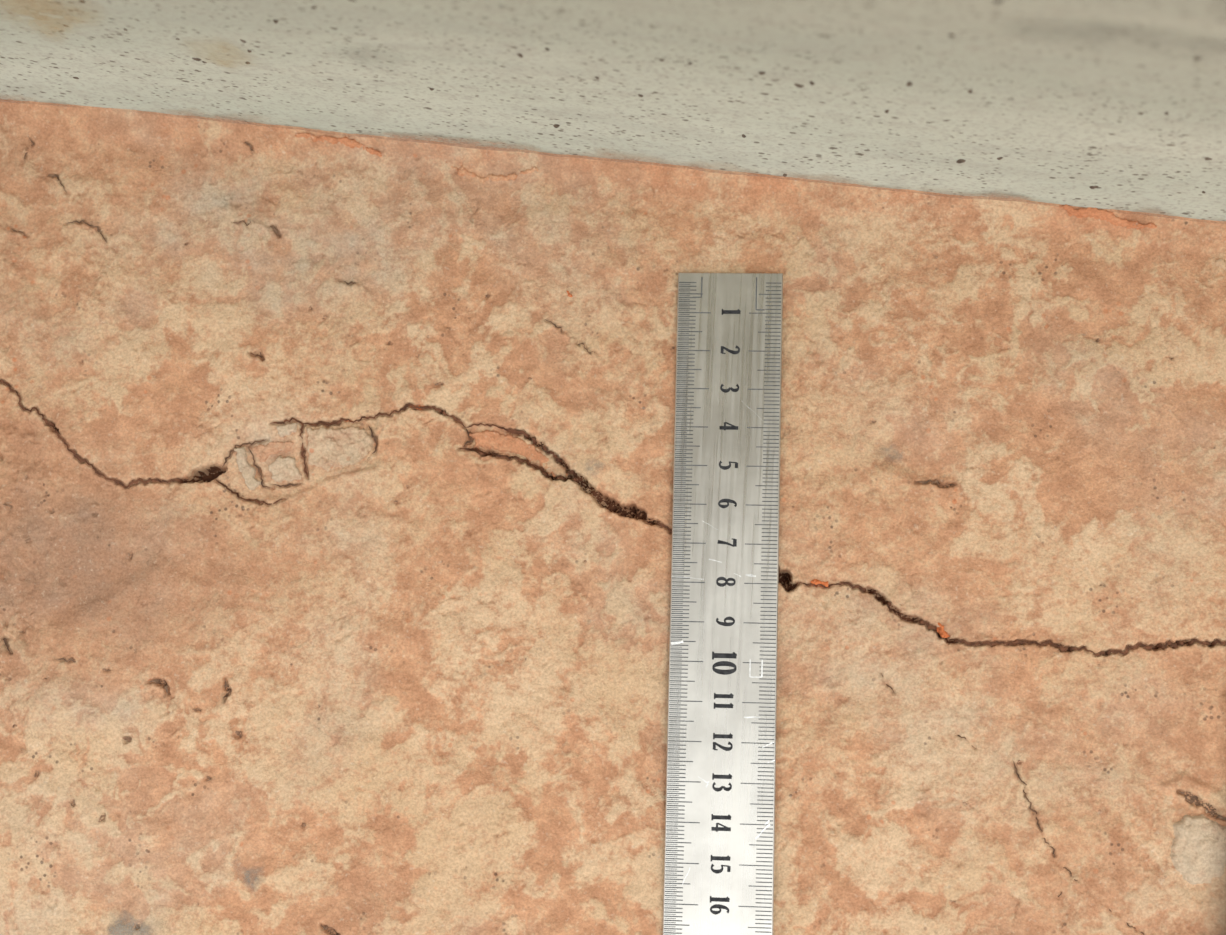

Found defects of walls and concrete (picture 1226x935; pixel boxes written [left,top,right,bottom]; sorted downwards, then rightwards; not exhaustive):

crack [0,379,672,533]
crack [778,571,1226,656]
spalling [1170,810,1226,885]